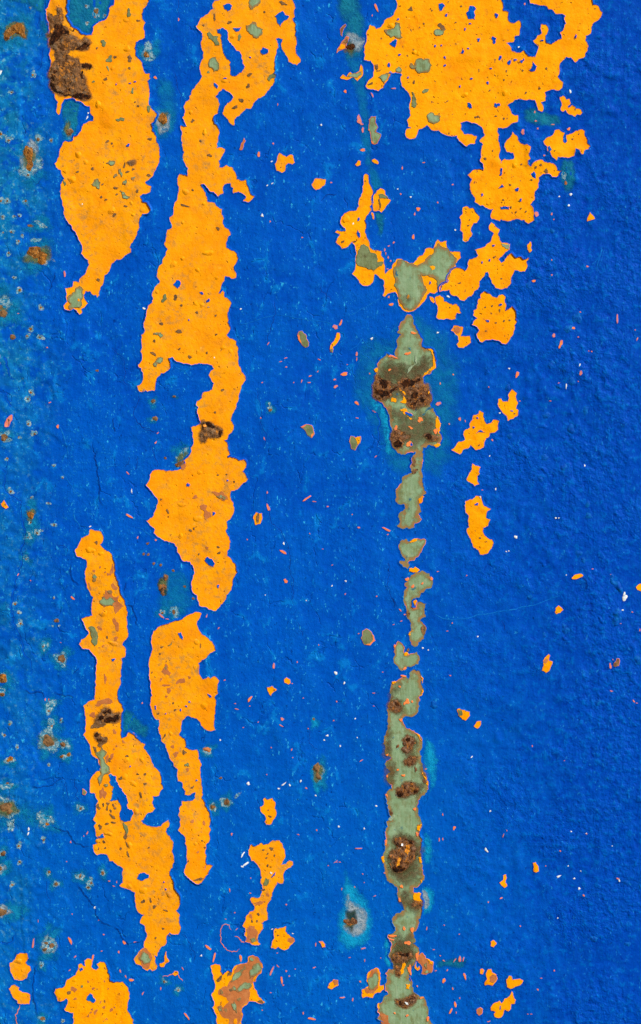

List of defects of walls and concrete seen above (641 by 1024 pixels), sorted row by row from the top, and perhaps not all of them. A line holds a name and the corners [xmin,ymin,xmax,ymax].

peeling [44,0,162,317]
peeling [73,0,303,980]
peeling [333,0,604,1024]
peeling [52,956,136,1024]
peeling [209,795,297,1024]
corrosion [339,878,372,949]